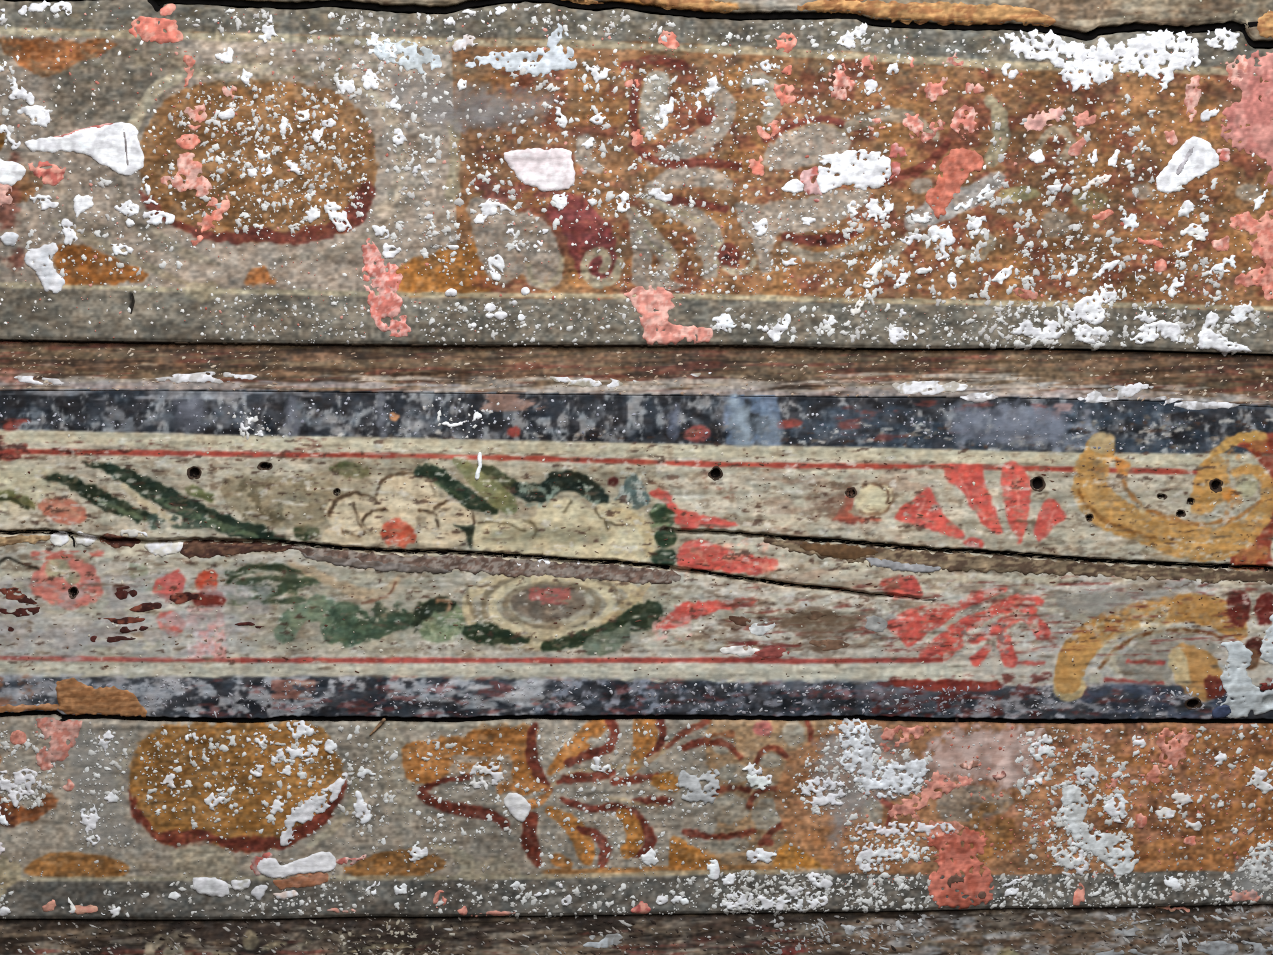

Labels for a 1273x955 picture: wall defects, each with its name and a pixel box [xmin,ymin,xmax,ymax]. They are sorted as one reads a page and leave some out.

crack [147,0,1273,47]
crack [0,529,75,547]
crack [278,540,935,601]
crack [676,530,1273,571]
peeling [90,586,201,643]
peeling [788,609,841,620]
crack [0,710,1273,723]
peeling [0,614,1273,955]